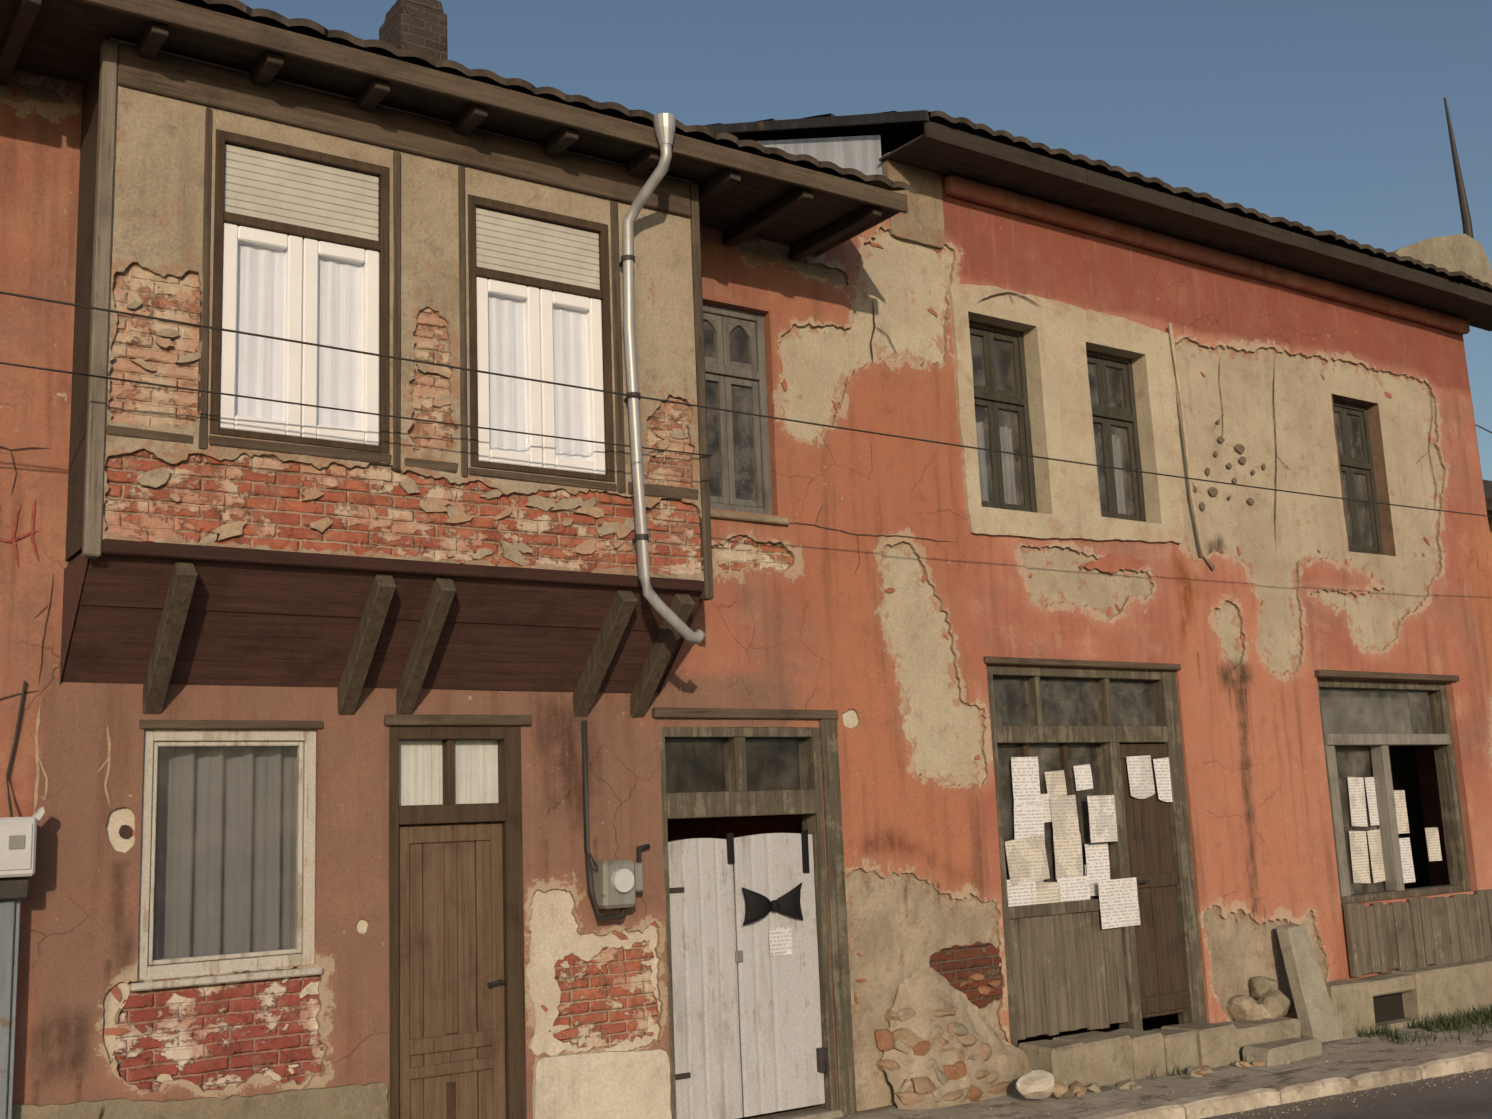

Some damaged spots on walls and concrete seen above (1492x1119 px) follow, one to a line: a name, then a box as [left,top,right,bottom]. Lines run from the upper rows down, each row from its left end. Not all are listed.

spalling [108,264,201,427]
spalling [408,307,456,452]
spalling [778,228,954,441]
crack [0,446,51,496]
spalling [103,396,793,575]
crack [789,506,950,576]
spalling [1175,338,1444,674]
crack [0,571,54,814]
spalling [879,542,986,786]
spalling [102,967,326,1091]
spalling [525,889,661,1056]
spalling [845,868,1006,1111]